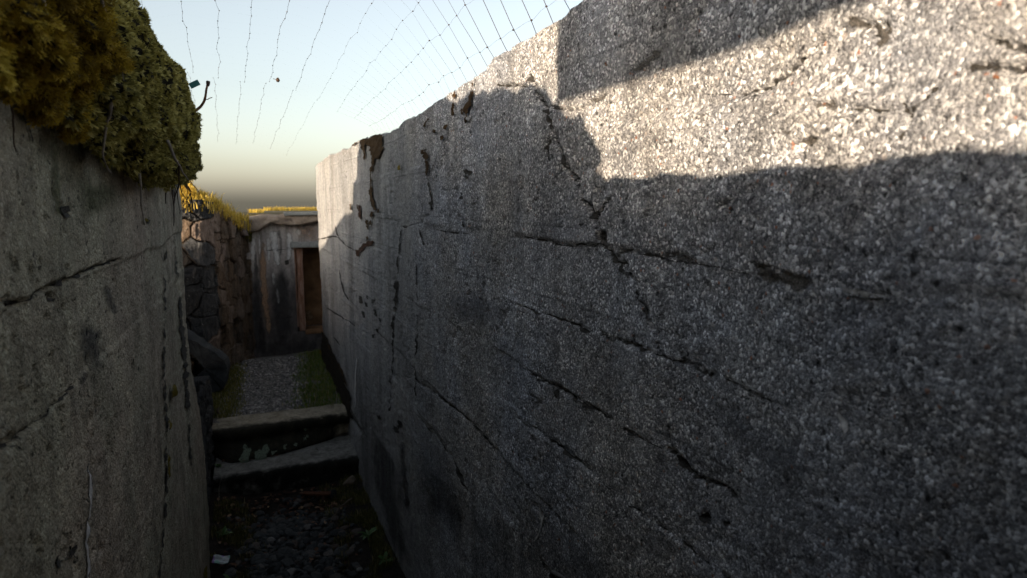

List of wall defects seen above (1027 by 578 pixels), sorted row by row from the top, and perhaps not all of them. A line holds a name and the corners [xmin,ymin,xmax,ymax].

crack [721,37,826,96]
crack [851,87,939,153]
crack [497,60,747,318]
crack [2,260,115,312]
crack [316,226,355,344]
crack [388,180,493,491]
crack [503,298,796,414]
crack [0,385,74,449]
crack [517,373,745,504]
crack [628,505,710,565]